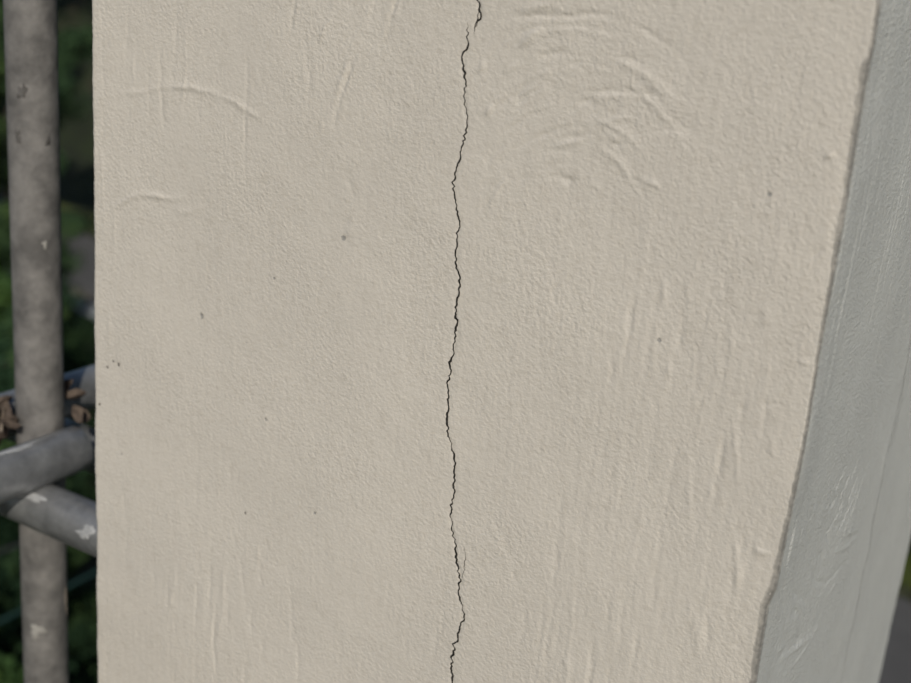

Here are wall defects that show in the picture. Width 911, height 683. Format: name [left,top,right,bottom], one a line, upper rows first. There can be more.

crack [446,0,482,683]